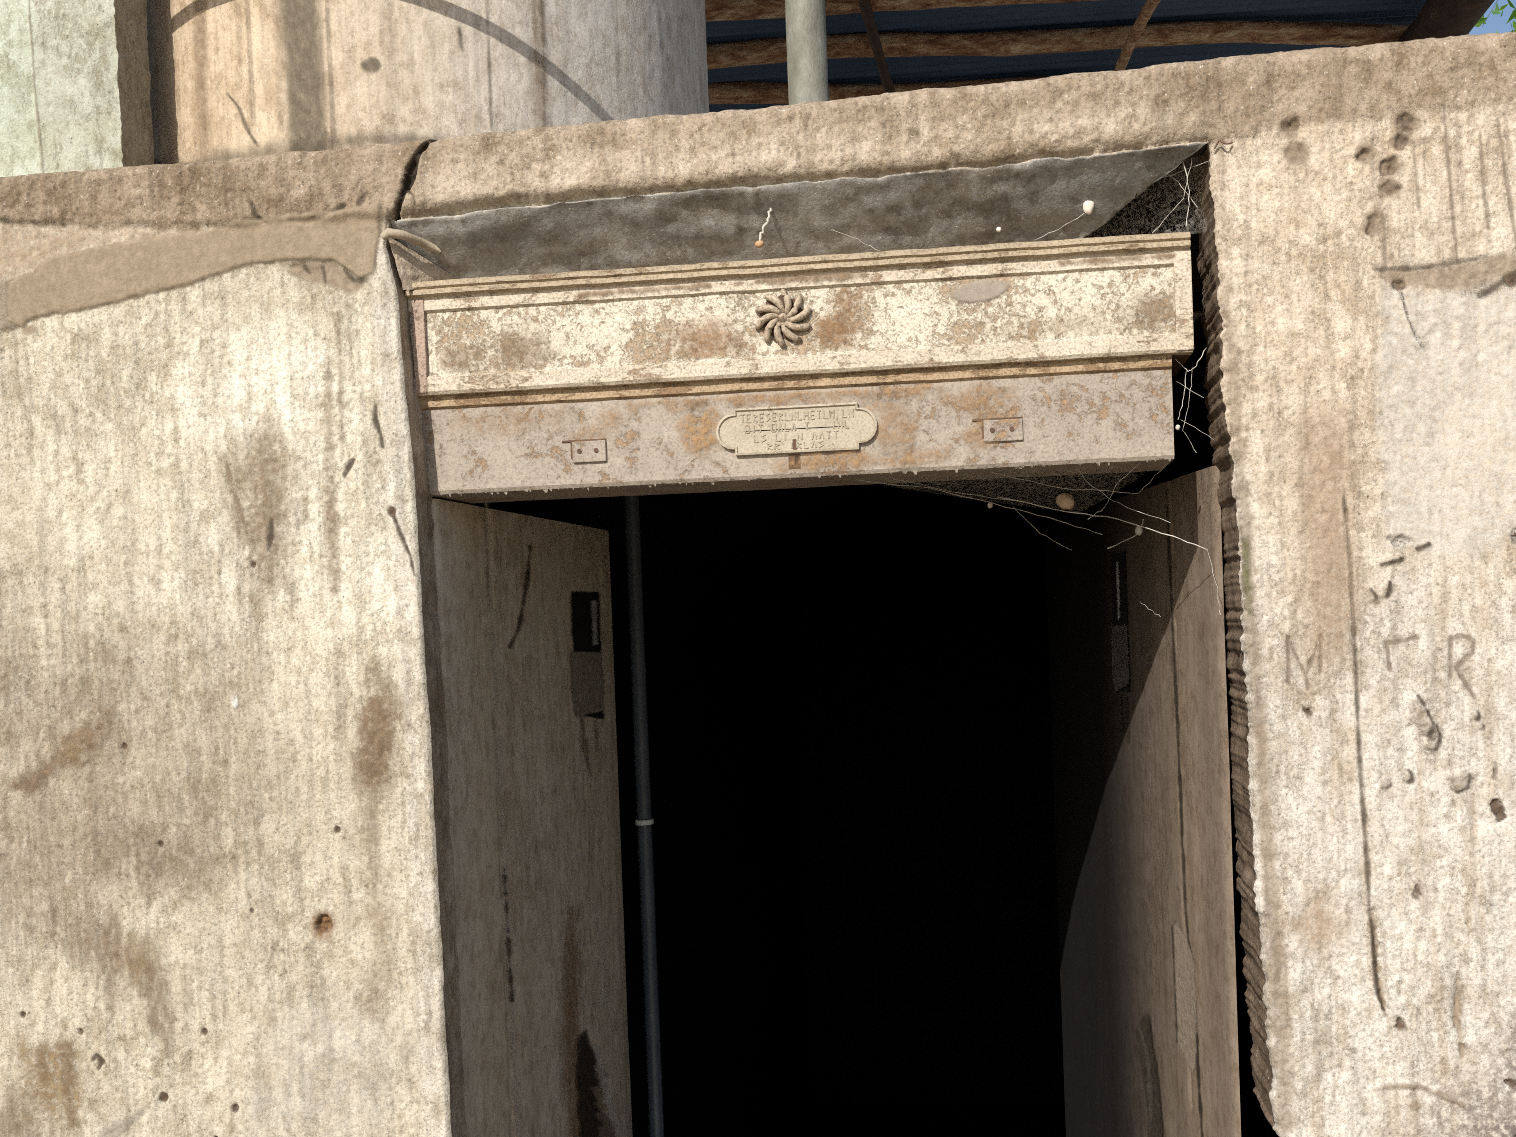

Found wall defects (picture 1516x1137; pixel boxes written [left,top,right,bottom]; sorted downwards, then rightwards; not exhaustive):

damp [282,0,332,152]
crack [333,140,437,221]
rust [681,324,733,357]
rust [755,272,866,343]
damp [357,696,394,784]